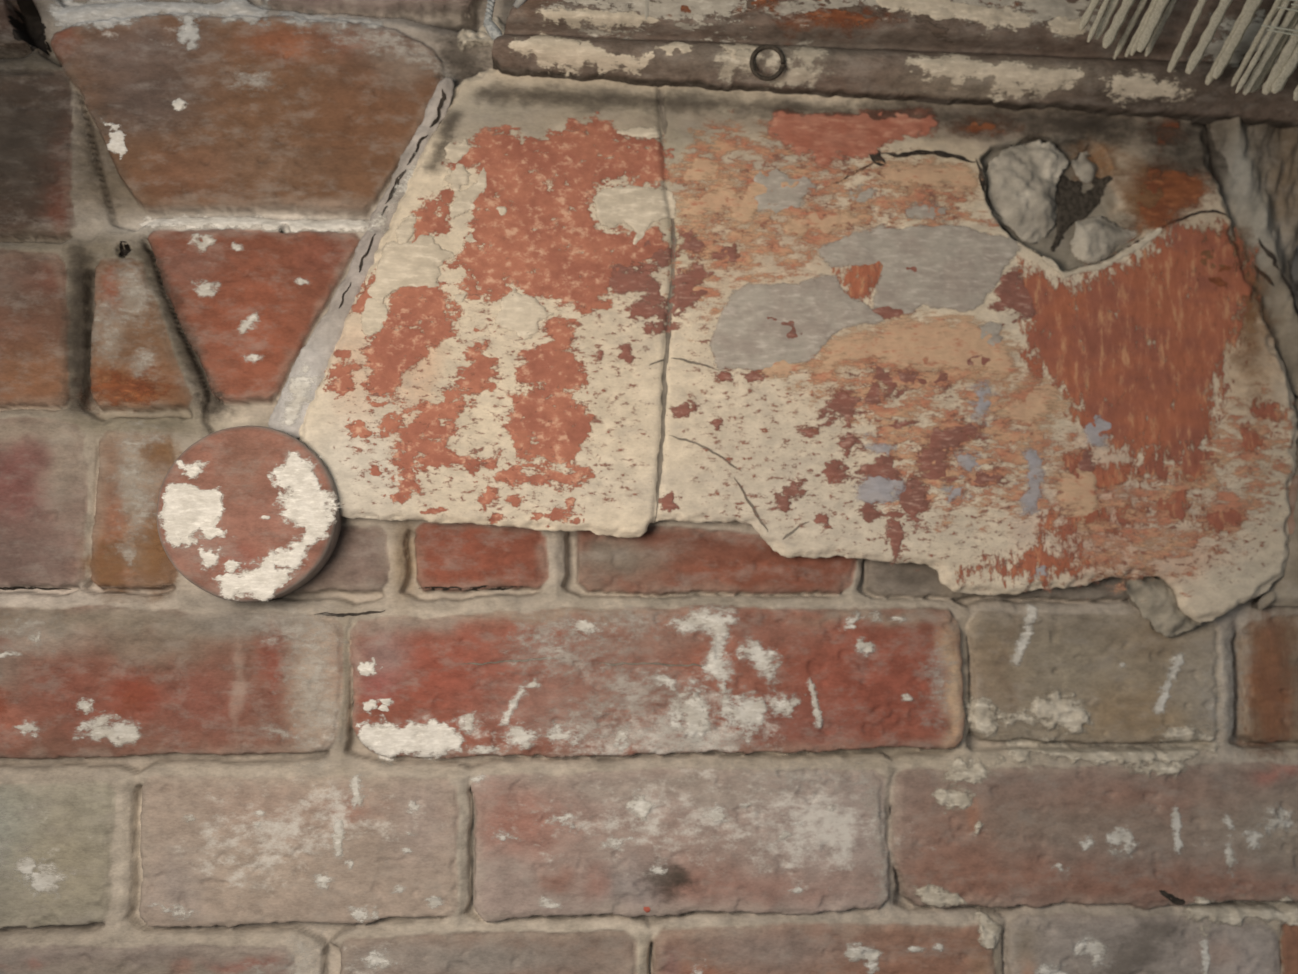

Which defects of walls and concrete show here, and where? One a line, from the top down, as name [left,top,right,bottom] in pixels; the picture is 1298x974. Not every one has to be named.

crack [657,89,668,134]
crack [822,150,1231,271]
crack [1253,239,1298,314]
crack [650,187,808,540]
peeling [322,106,1296,597]
water stain [357,657,376,676]
water stain [539,612,643,673]
water stain [610,606,823,748]
water stain [845,611,906,656]
water stain [356,679,642,765]
water stain [626,789,654,821]
water stain [540,897,560,908]